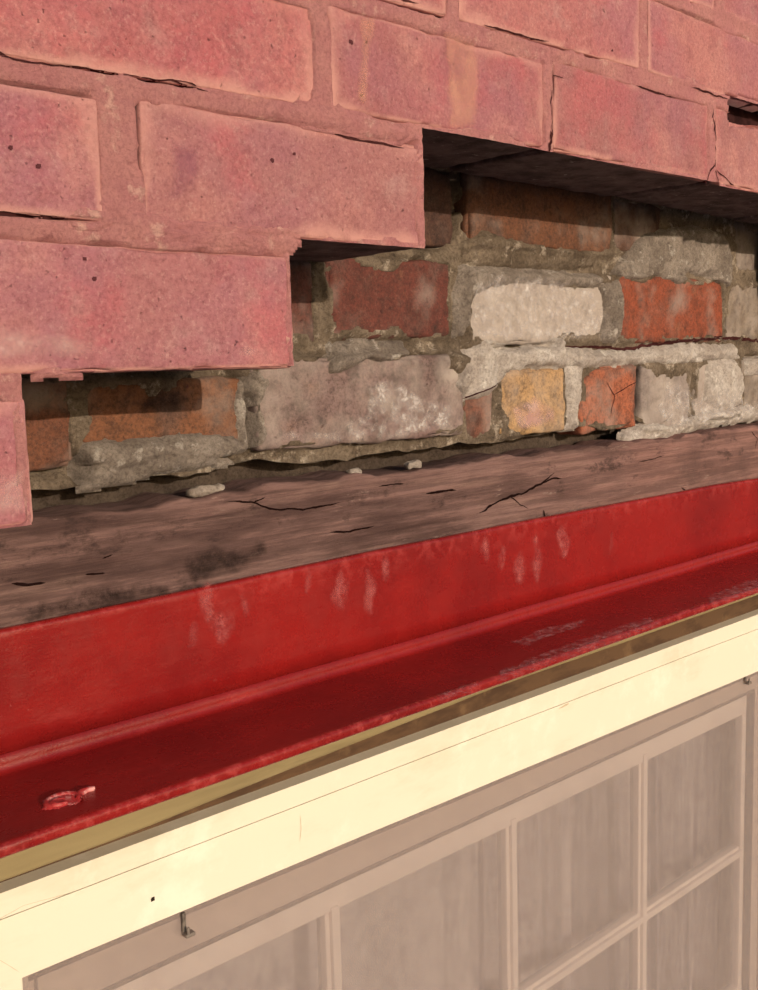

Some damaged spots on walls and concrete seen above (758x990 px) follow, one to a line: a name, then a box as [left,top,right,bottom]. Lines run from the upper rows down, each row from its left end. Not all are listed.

crack [0,51,205,91]
peeling [727,105,758,126]
spalling [21,167,758,494]
crack [228,497,344,511]
crack [426,487,455,495]
crack [480,473,562,516]
crack [330,525,373,533]
water stain [190,545,263,577]
crack [11,580,45,588]